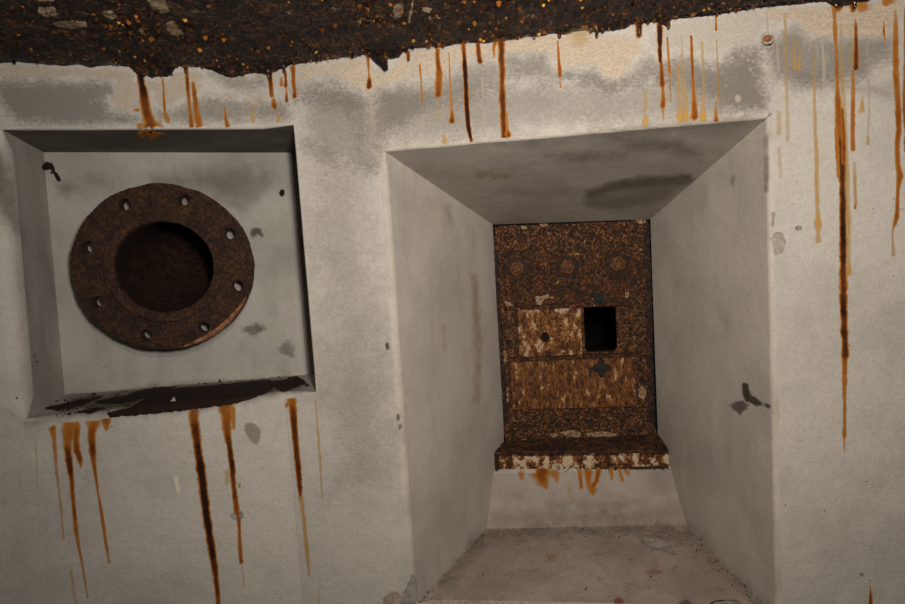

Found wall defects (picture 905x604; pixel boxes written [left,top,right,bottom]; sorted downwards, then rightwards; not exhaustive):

corrosion [0,0,869,448]
leakage [594,177,689,193]
corrosion [883,8,905,232]
corrosion [45,376,310,604]
flaking render [383,575,417,604]